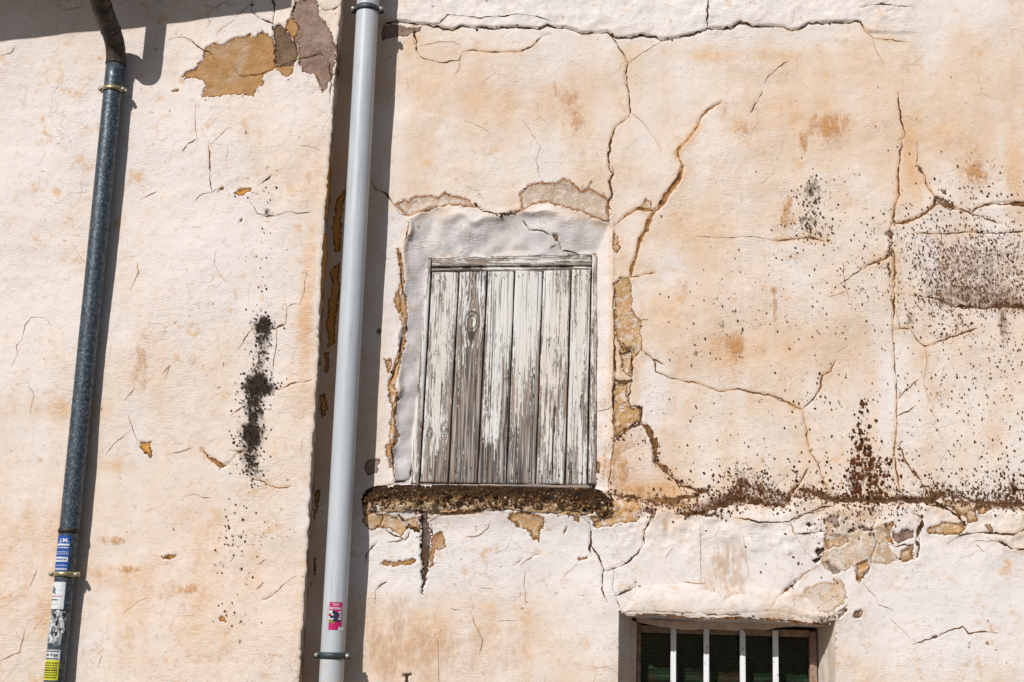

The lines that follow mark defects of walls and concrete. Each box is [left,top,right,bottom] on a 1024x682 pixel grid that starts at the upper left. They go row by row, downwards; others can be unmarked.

flaking render [172,0,341,100]
flaking render [381,24,422,41]
flaking render [217,187,251,196]
flaking render [395,191,481,217]
damp [214,254,291,627]
flaking render [364,248,408,475]
crack [371,182,412,486]
flaking render [611,276,642,438]
crack [365,0,1024,643]
damp [597,152,1024,551]
flaking render [362,498,678,595]
flaking render [799,514,915,618]